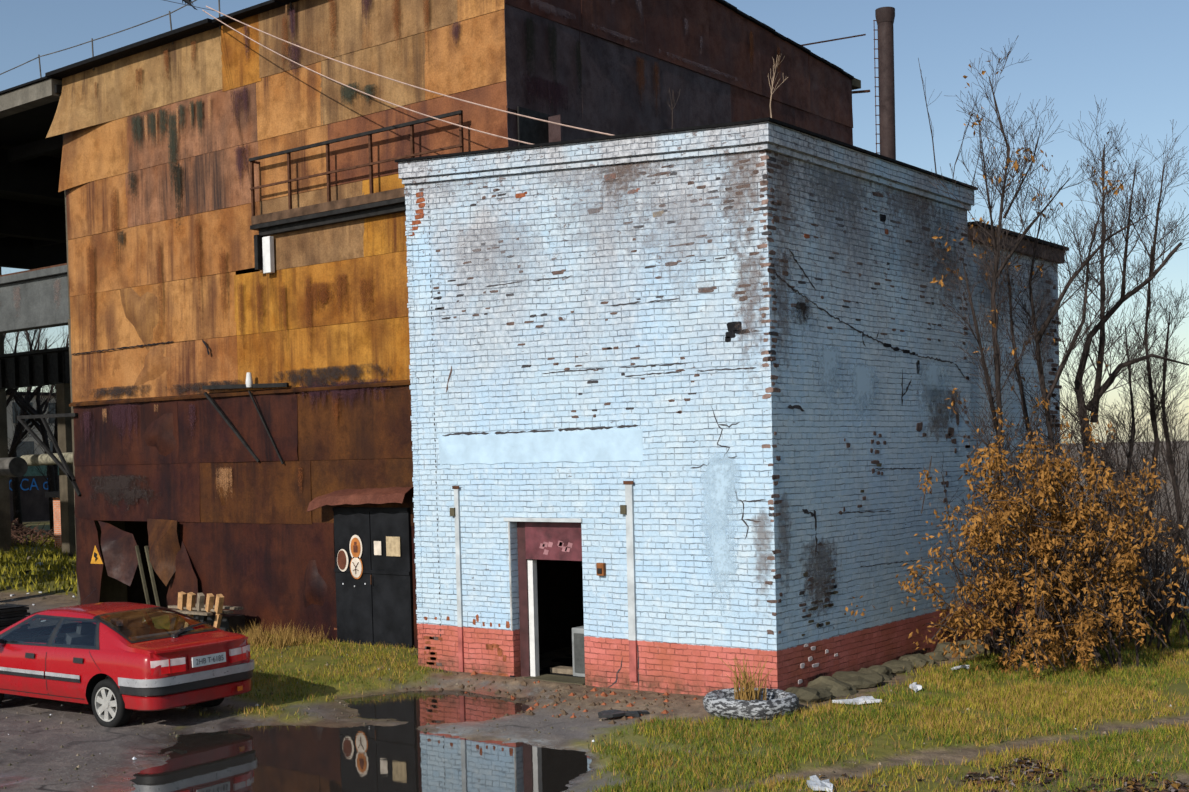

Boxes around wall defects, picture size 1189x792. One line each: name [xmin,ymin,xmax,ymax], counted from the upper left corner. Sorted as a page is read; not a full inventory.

rust [306,275,372,335]
peeling [433,238,523,319]
peeling [506,311,574,328]
peeling [599,150,823,399]
crack [775,250,965,404]
crack [543,363,756,377]
peeling [668,357,700,414]
crack [692,406,739,468]
crack [788,404,804,412]
peeling [762,432,782,522]
crack [734,487,764,538]
peeling [765,549,783,616]